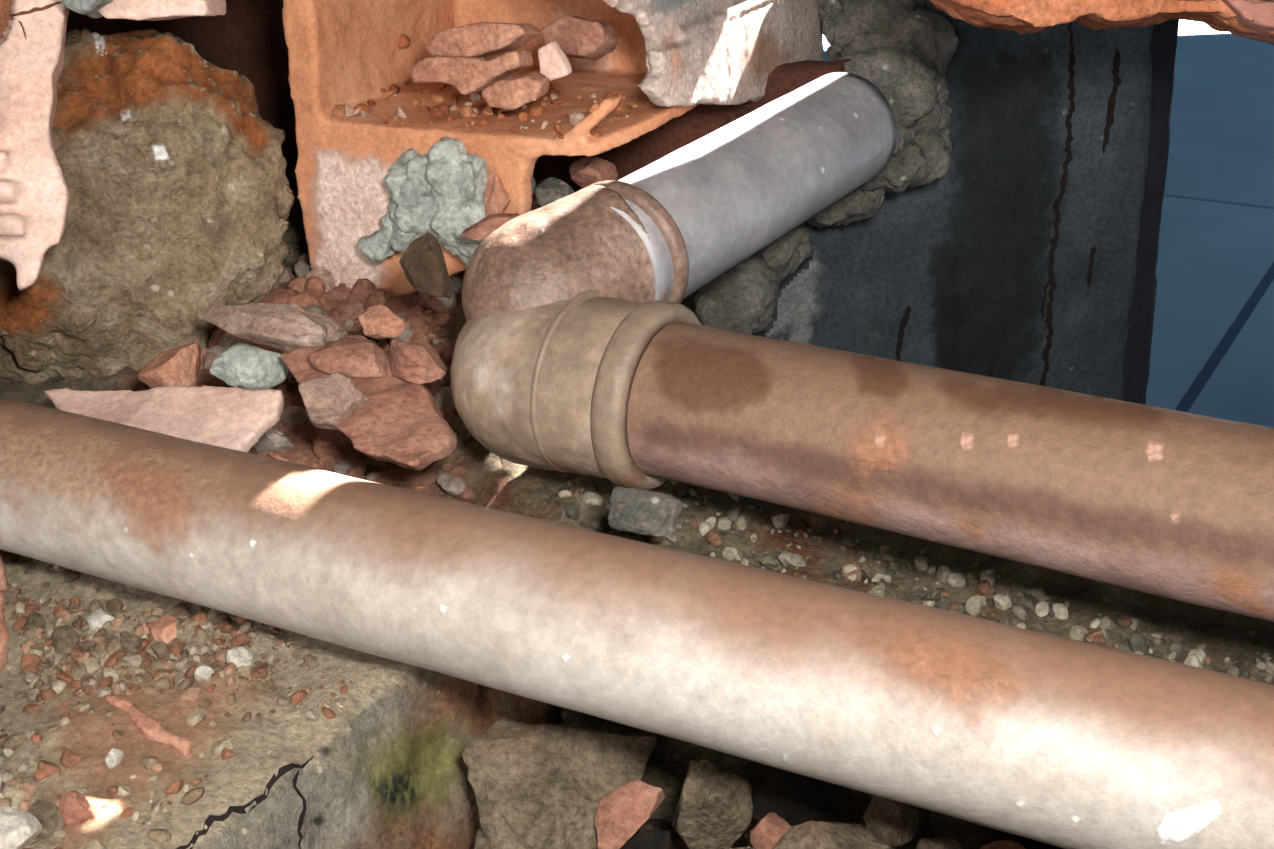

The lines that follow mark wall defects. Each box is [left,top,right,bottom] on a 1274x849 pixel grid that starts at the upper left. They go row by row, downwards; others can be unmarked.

spalling [80,0,97,12]
spalling [929,0,1274,45]
crack [1039,22,1150,386]
crack [176,756,314,849]